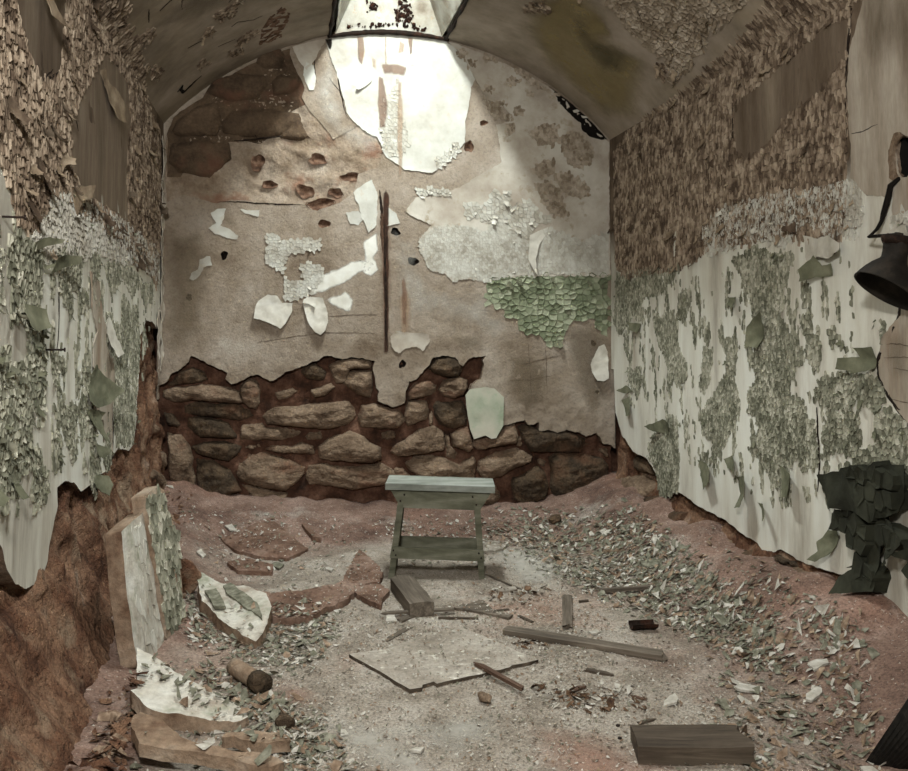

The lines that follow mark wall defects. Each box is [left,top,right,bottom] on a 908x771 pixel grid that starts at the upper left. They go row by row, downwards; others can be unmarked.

peeling [0,0,612,655]
peeling [466,0,908,521]
peeling [806,530,839,562]